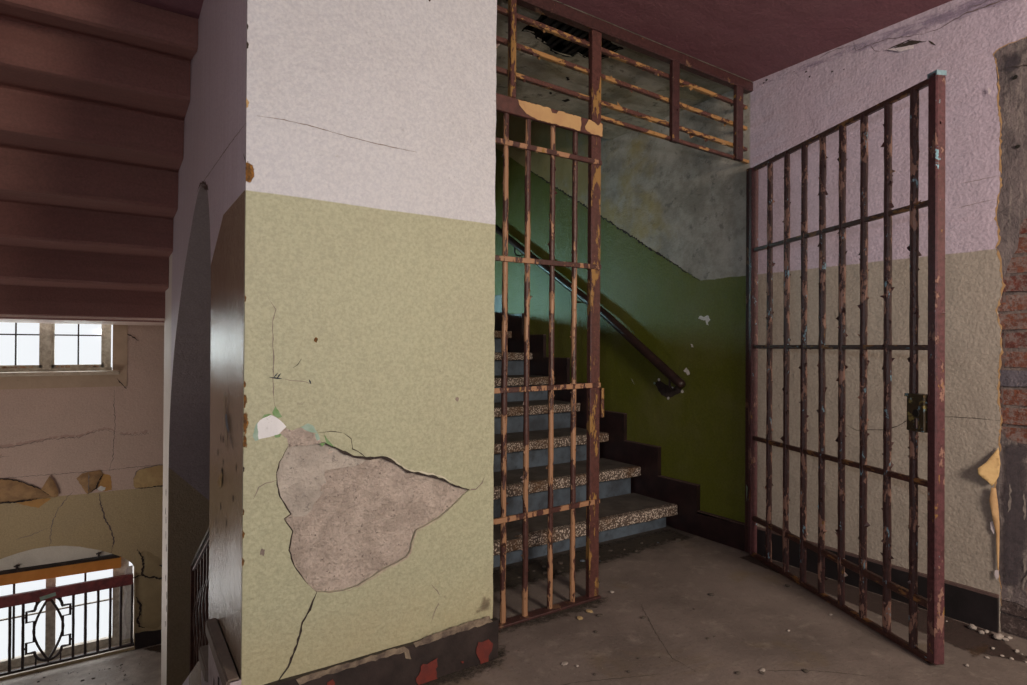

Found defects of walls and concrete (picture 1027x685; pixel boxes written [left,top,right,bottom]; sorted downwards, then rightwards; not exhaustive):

spalling [522,14,624,59]
crack [205,116,415,179]
spalling [978,37,1027,640]
peeling [0,476,59,508]
crack [0,380,162,628]
peeling [77,470,112,494]
peeling [133,465,163,489]
spalling [253,406,485,593]
crack [279,592,317,680]
peeling [296,616,493,685]